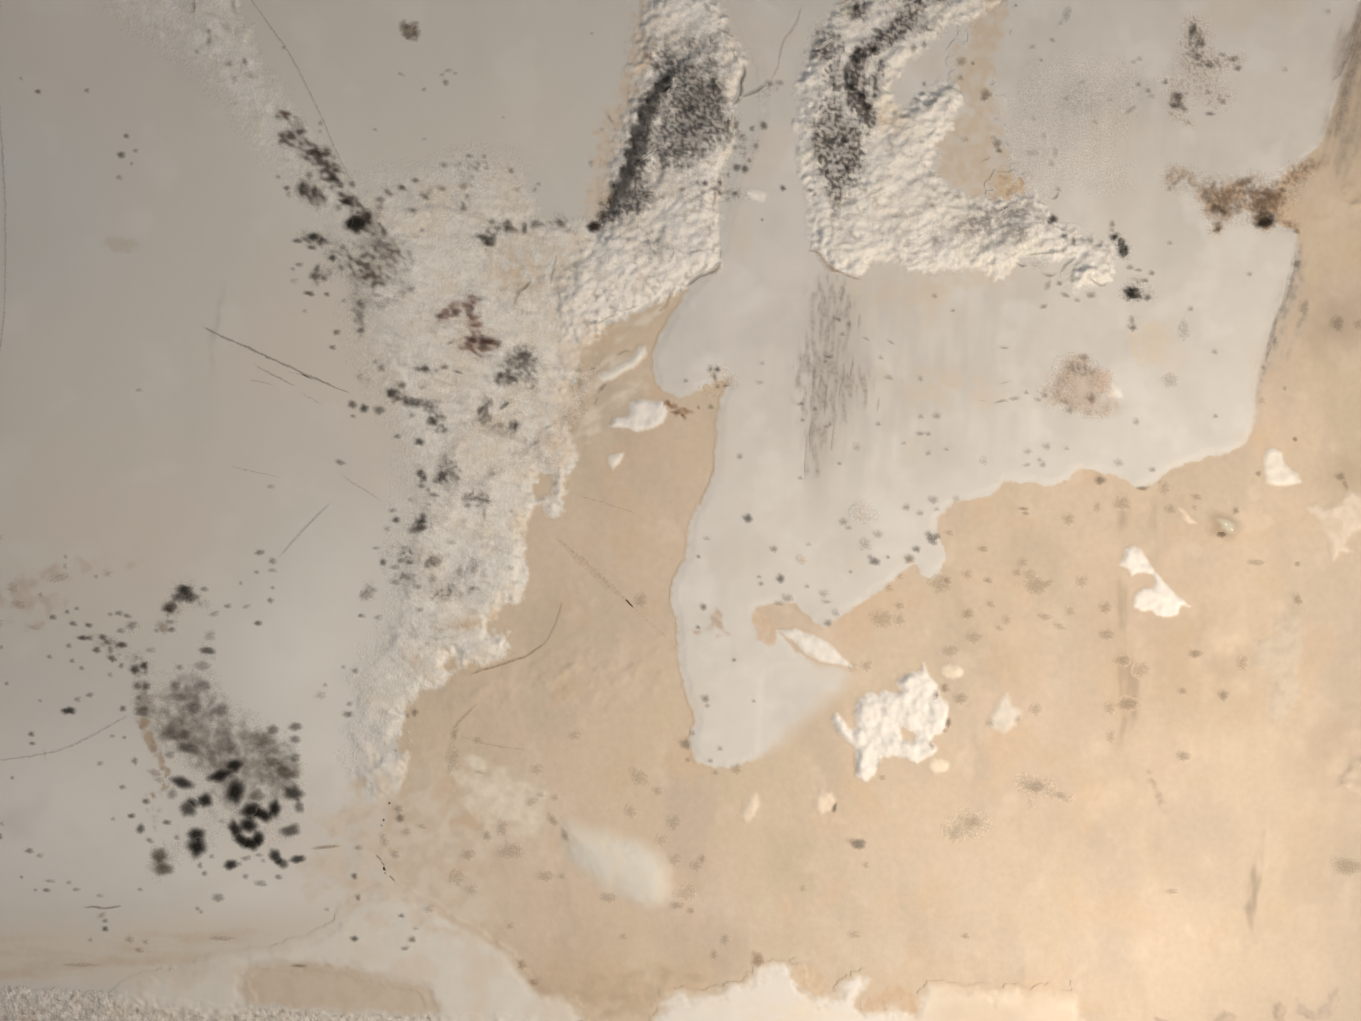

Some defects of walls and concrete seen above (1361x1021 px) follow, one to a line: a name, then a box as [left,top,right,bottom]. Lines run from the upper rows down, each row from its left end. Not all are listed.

spalling [98,0,352,238]
leakage [270,0,785,351]
leakage [1158,154,1317,238]
leakage [1260,251,1309,370]
leakage [347,286,602,621]
leakage [683,361,766,410]
flaking render [332,138,1361,1021]
leakage [839,494,961,629]
leakage [0,549,364,892]
leakage [927,682,969,751]
leakage [845,838,870,869]
leakage [0,875,446,1020]